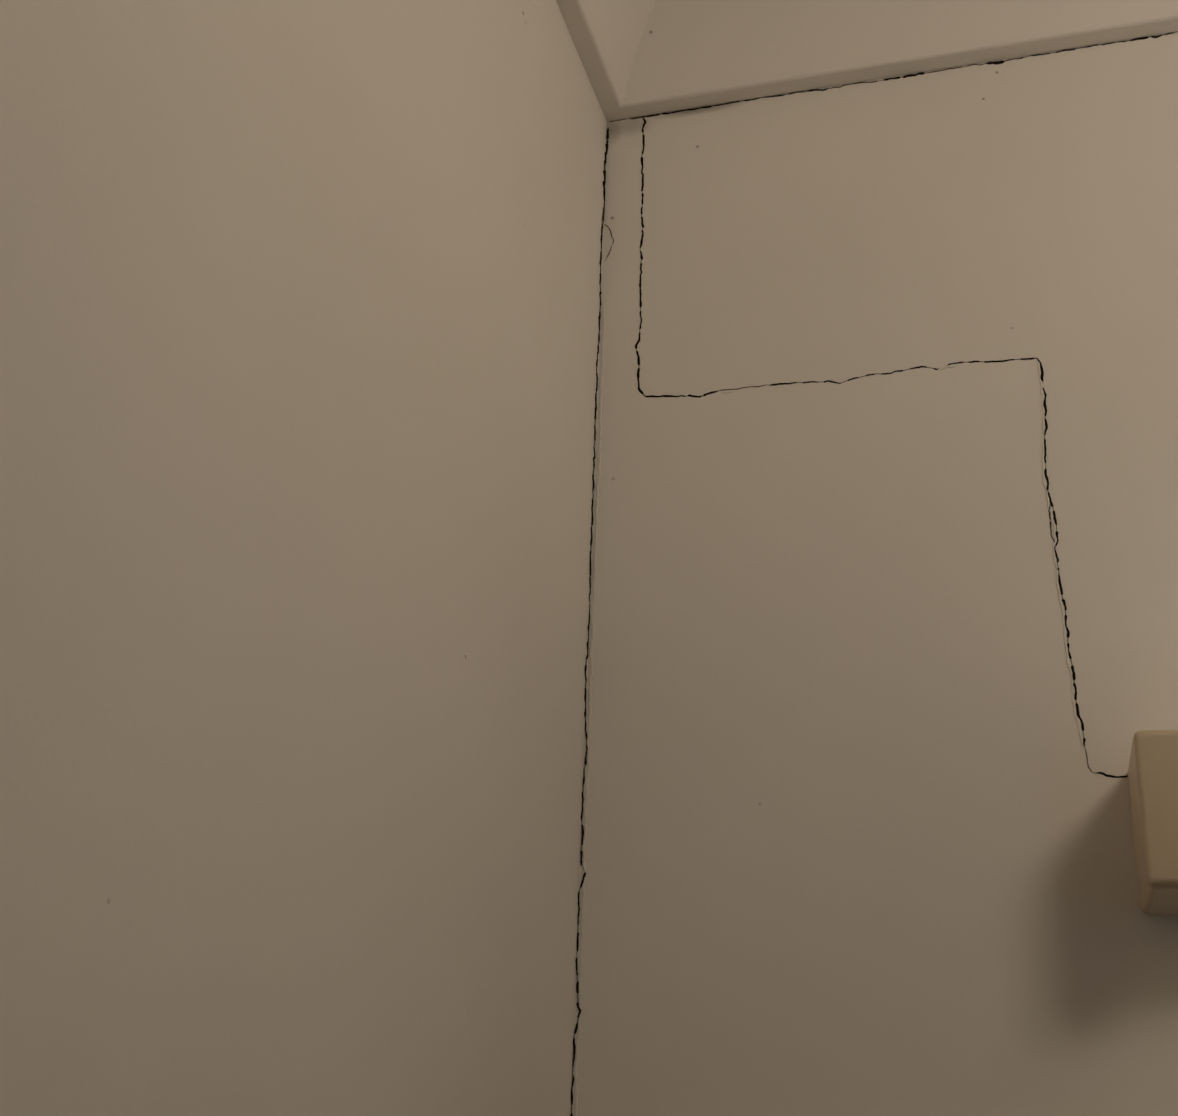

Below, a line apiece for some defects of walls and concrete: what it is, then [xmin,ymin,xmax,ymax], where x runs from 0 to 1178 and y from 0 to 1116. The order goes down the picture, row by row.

crack [570,32,1175,1116]